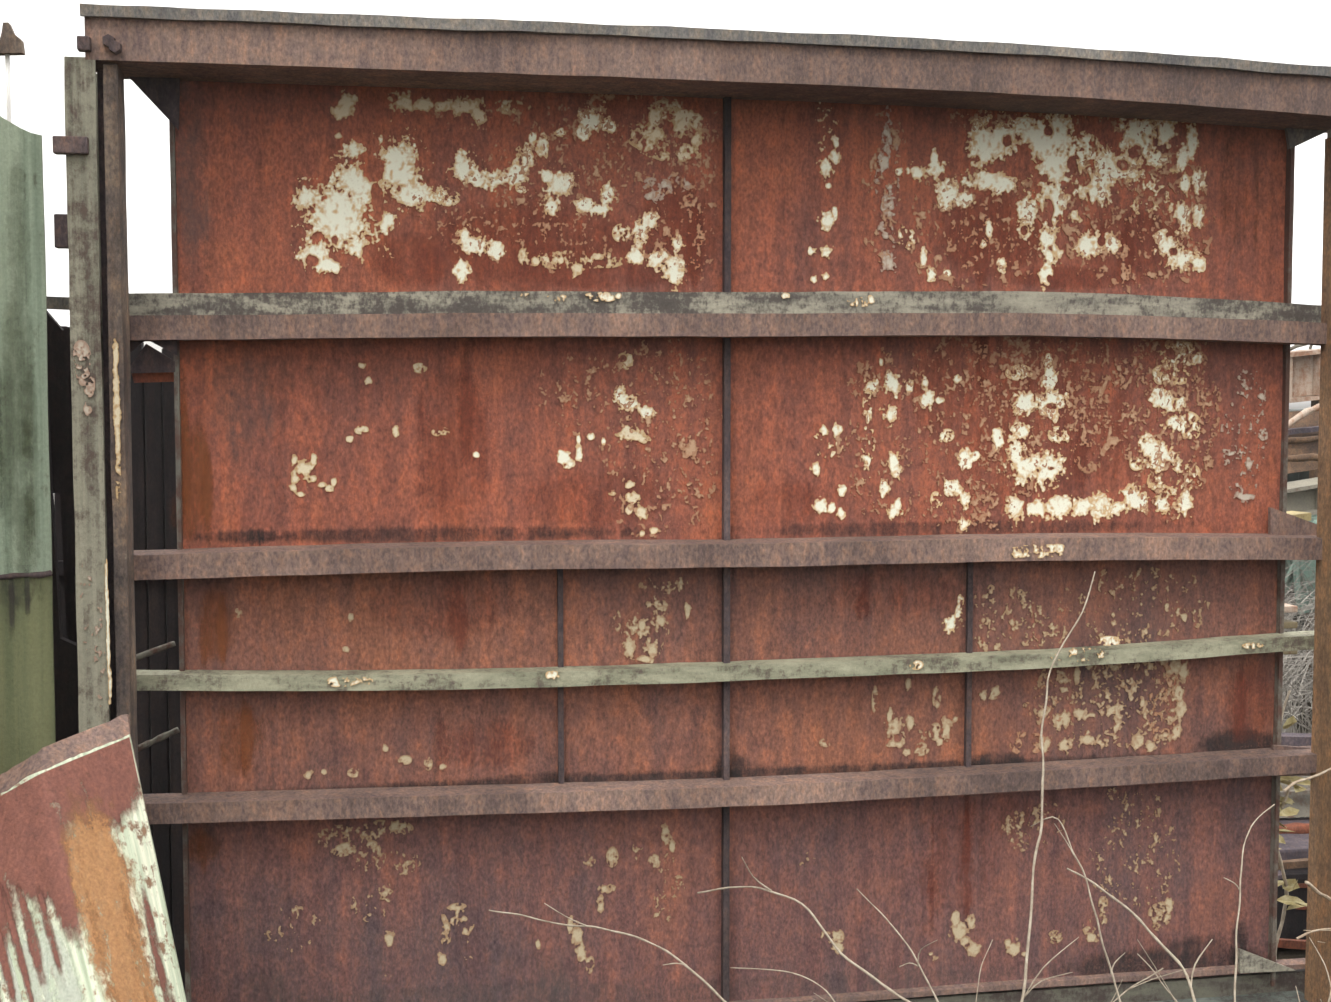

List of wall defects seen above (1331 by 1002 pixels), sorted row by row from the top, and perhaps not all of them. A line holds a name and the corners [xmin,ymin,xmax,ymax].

peeling [290,89,723,292]
rust [420,210,604,281]
rust [650,188,708,279]
peeling [861,105,1216,294]
rust [946,201,1174,288]
rust [180,396,211,537]
peeling [539,337,723,540]
peeling [1011,544,1065,558]
peeling [809,337,1268,534]
peeling [871,686,958,756]
peeling [942,567,1210,755]
rust [0,737,175,1002]